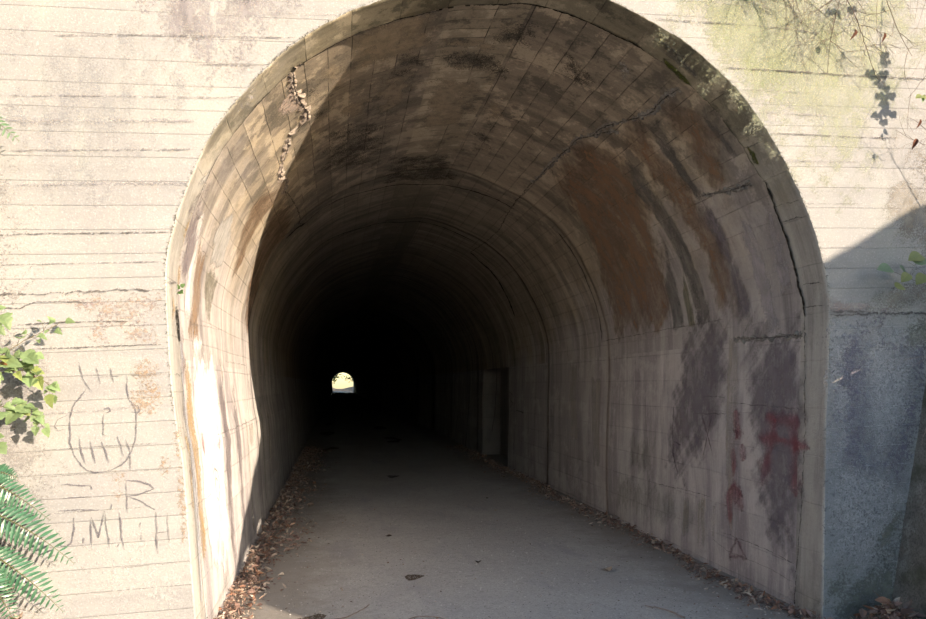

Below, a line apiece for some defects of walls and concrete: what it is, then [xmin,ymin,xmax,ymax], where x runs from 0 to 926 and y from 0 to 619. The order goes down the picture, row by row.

leakage [438,22,538,80]
corrosion [131,359,162,415]
corrosion [161,362,206,560]
corrosion [236,193,290,330]
leakage [321,124,463,184]
crack [0,2,926,350]
corrosion [630,122,729,303]
leakage [629,164,737,524]
leakage [707,212,750,320]
crack [695,377,806,604]
leakage [742,214,806,541]